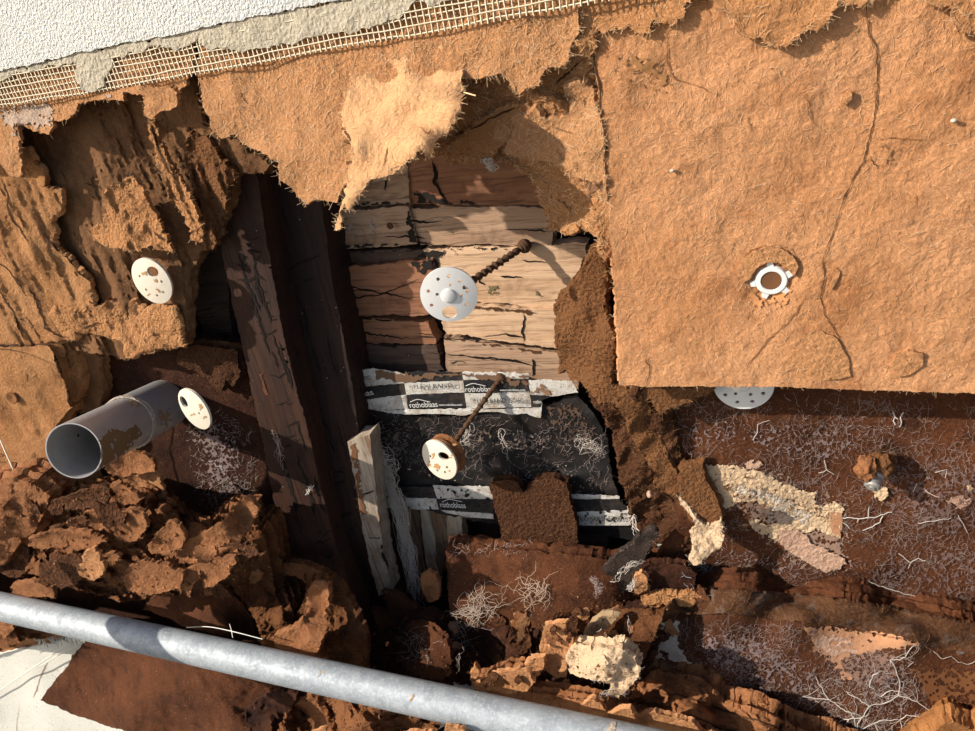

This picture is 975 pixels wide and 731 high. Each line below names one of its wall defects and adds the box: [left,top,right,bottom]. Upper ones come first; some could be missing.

peeling [711,0,875,56]
peeling [918,0,975,44]
peeling [0,0,696,231]
crack [743,0,920,372]
spalling [176,337,248,394]
spalling [552,239,726,549]
mould [477,430,575,451]
mould [684,415,865,465]
spalling [672,536,691,558]
damp [717,550,801,584]
mould [845,455,975,600]
damp [695,626,846,717]